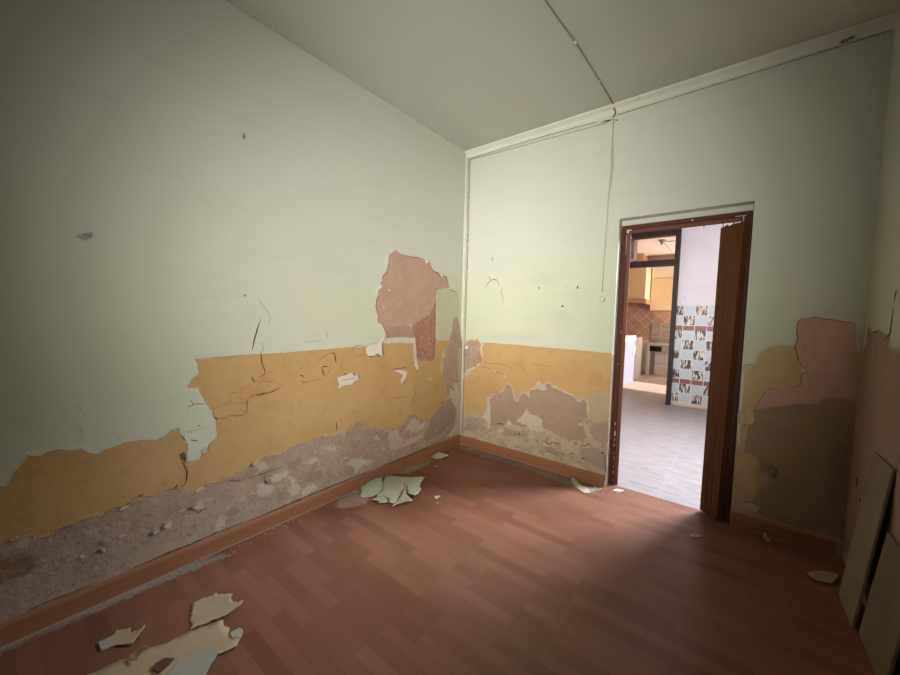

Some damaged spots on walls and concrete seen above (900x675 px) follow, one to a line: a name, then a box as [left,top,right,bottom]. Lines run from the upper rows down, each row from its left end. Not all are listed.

crack [188,300,280,421]
crack [135,442,439,567]
flaking render [0,248,616,623]
flaking render [731,316,900,601]